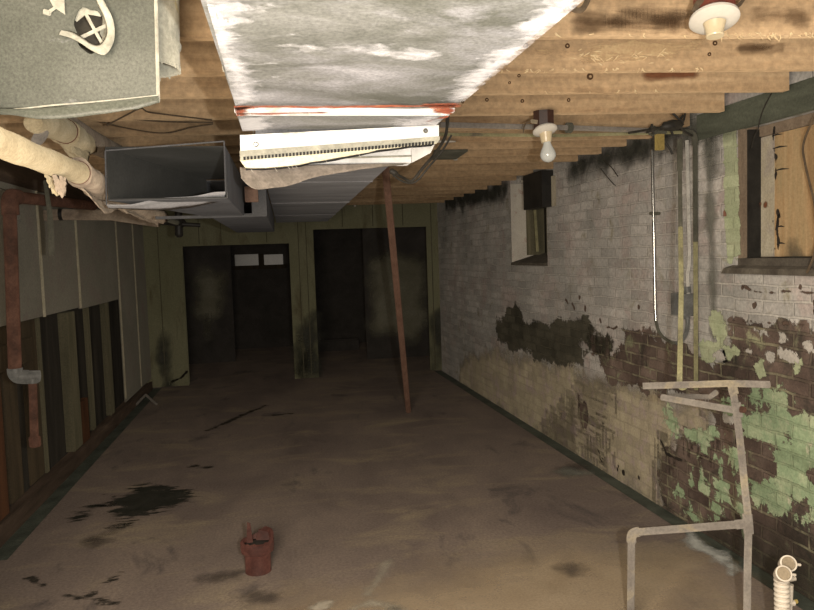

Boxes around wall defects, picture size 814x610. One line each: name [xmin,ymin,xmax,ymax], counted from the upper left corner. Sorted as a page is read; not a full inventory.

corrosion [234,103,461,119]
flaking render [496,295,814,576]
water stain [66,484,199,529]